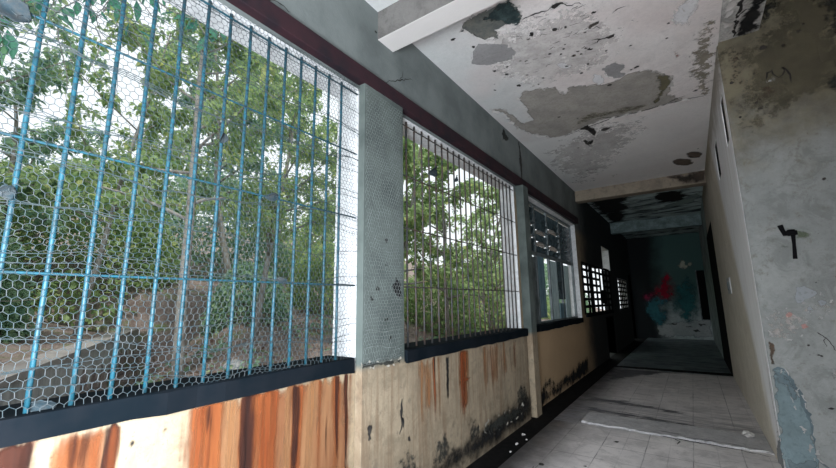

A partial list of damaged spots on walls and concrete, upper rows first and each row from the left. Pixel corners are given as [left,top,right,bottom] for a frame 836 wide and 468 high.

peeling [451,0,697,148]
leakage [739,0,836,127]
corrosion [0,441,34,468]
corrosion [50,423,120,468]
corrosion [189,374,351,468]
corrosion [421,358,440,410]
corrosion [459,351,470,411]
leakage [433,386,531,468]
leakage [541,359,588,407]
flaking render [773,367,825,468]